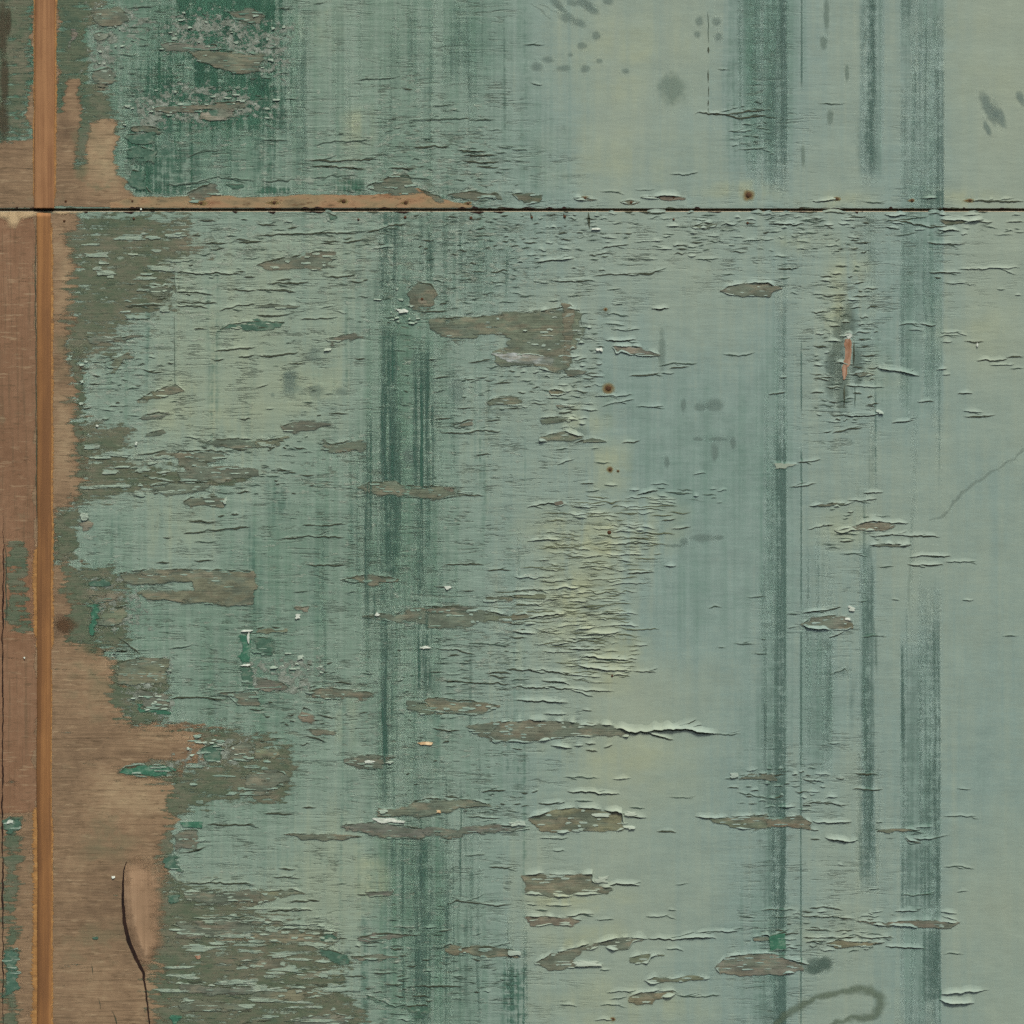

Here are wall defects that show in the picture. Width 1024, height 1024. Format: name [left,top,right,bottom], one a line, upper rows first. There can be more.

peeling [720,276,782,297]
peeling [390,279,608,443]
peeling [0,0,431,1024]
peeling [406,695,630,743]
water stain [777,453,786,928]
peeling [283,795,637,841]
peeling [521,866,612,897]
crack [122,862,150,1024]
peeling [534,927,804,1005]
water stain [778,975,786,1024]